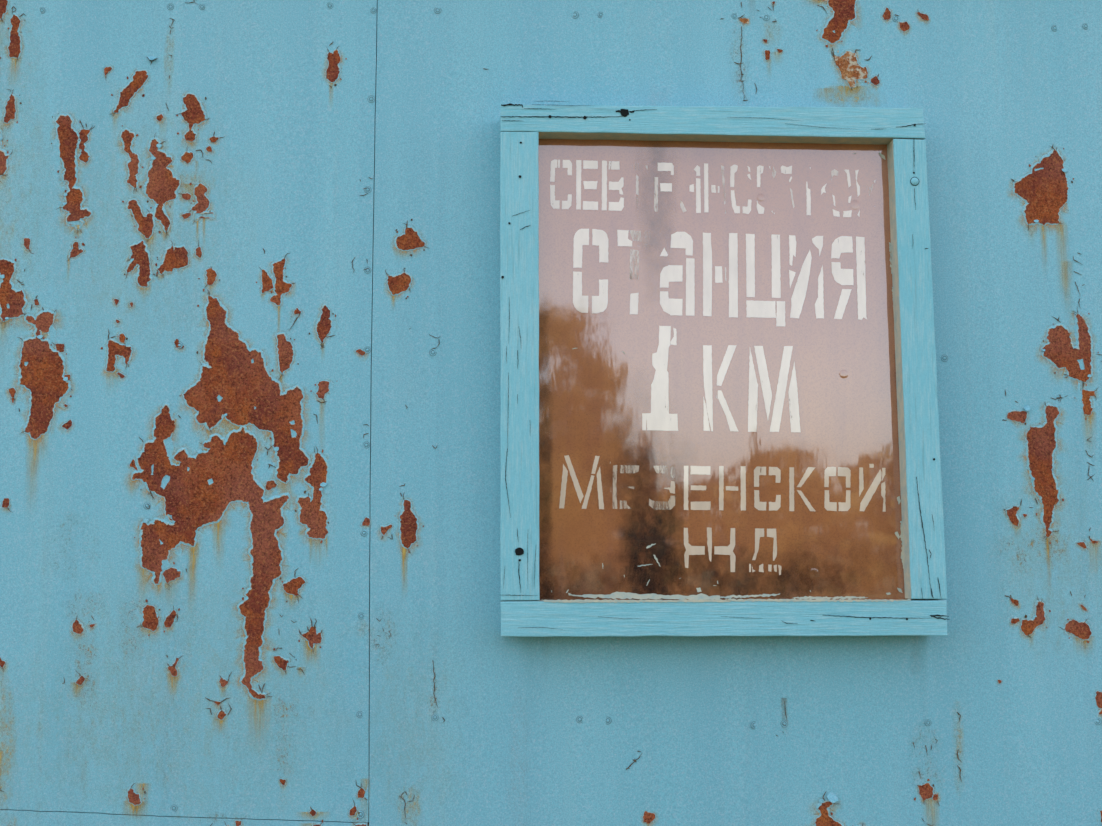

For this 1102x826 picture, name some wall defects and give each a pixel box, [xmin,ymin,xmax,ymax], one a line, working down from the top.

corrosion [0,0,26,69]
corrosion [816,0,872,102]
corrosion [51,113,95,261]
corrosion [111,56,215,289]
corrosion [256,249,295,310]
corrosion [394,219,428,257]
corrosion [1011,145,1074,237]
corrosion [0,257,72,456]
corrosion [1041,310,1099,423]
corrosion [131,267,330,717]
corrosion [399,484,424,567]
corrosion [1003,390,1064,563]